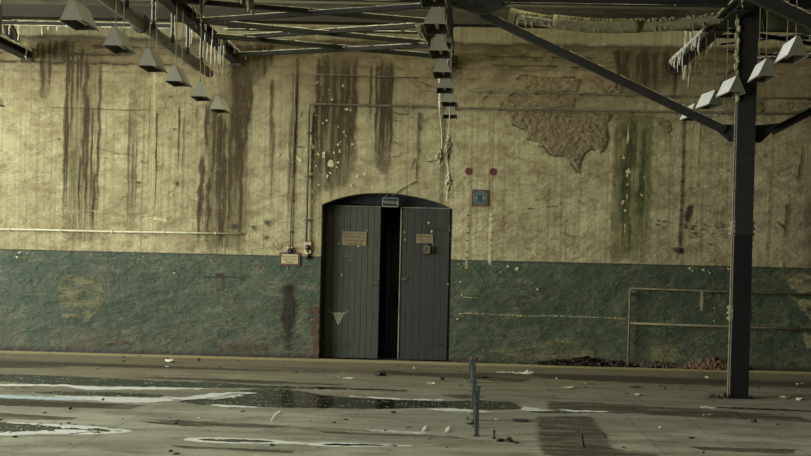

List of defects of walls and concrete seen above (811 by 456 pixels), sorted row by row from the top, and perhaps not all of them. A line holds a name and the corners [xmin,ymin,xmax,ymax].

spalling [499,75,612,173]
leakage [615,129,651,243]
leakage [282,286,295,337]